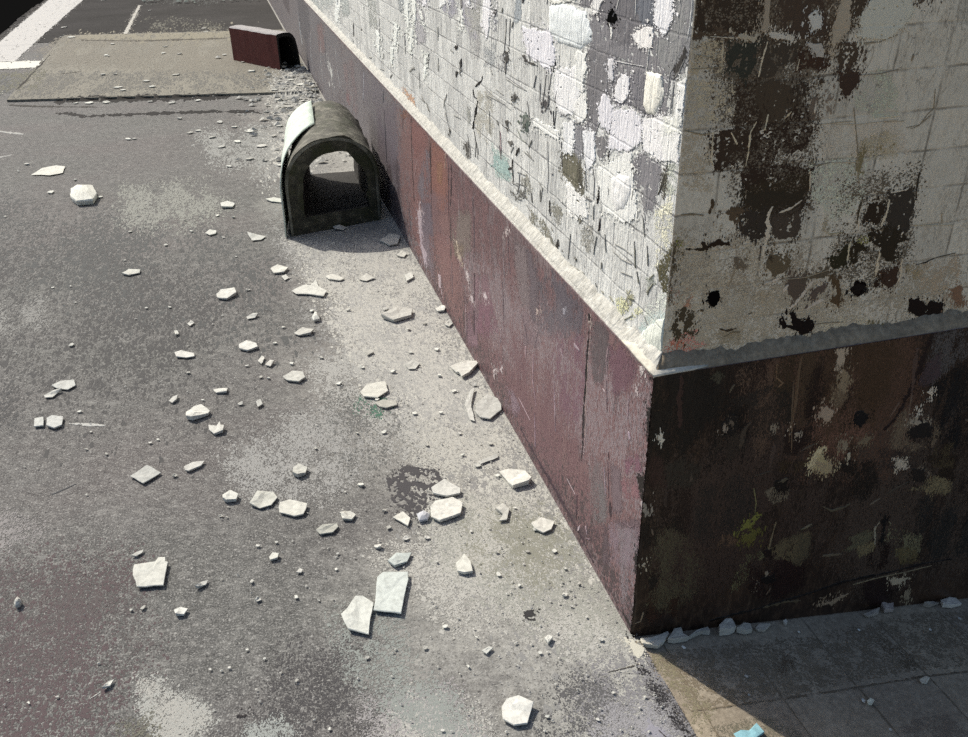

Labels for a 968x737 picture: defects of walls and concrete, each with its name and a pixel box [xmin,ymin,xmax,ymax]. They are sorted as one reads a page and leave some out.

spalling [502,47,538,70]
peeling [490,92,531,182]
peeling [558,0,968,349]
crack [298,8,665,563]
crack [660,375,684,436]